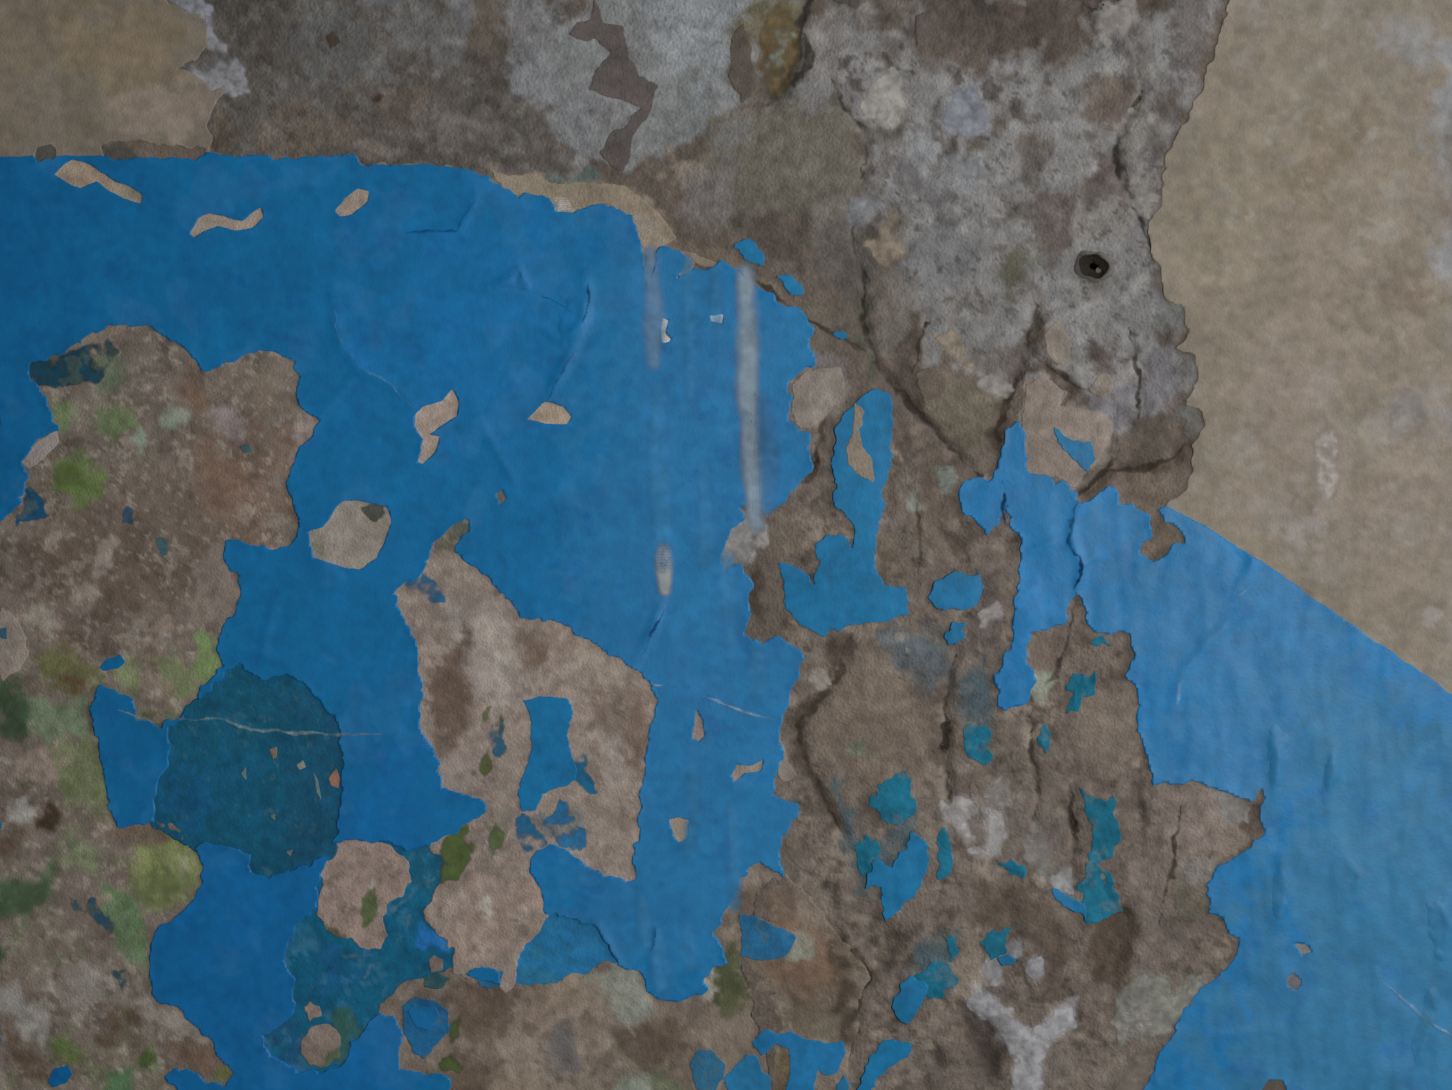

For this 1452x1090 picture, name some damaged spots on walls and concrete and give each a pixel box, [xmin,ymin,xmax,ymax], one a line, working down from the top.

peeling [35,144,142,203]
peeling [101,140,205,160]
damp [645,249,663,367]
damp [713,265,775,530]
damp [653,392,672,595]
flaking render [167,0,1266,1090]
peeling [0,325,391,1090]
crack [940,703,951,749]
crack [1028,729,1036,765]
crack [1068,794,1079,840]
crack [1159,806,1181,924]
peeling [1262,1080,1286,1090]